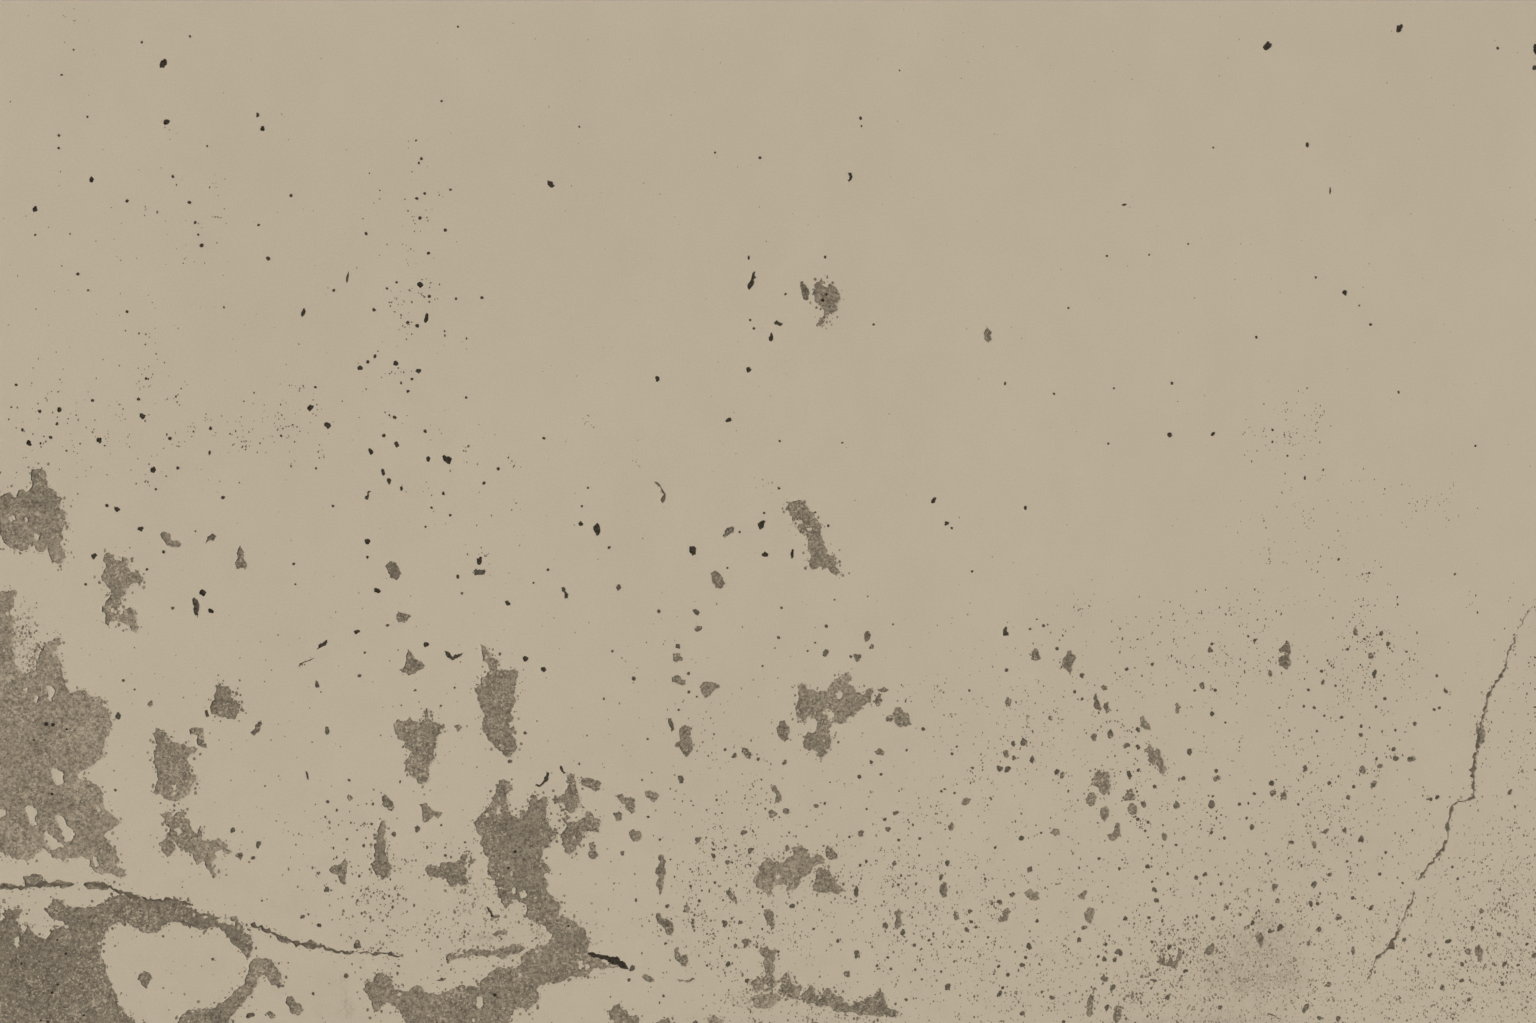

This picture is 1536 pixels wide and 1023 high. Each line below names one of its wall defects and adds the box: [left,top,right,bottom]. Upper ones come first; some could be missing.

peeling [800,277,842,327]
peeling [0,467,69,566]
peeling [785,498,840,578]
peeling [100,551,145,634]
peeling [392,643,520,823]
peeling [776,671,913,759]
peeling [0,589,304,1023]
crack [1366,599,1536,981]
crack [0,879,194,907]
crack [249,921,401,958]
peeling [361,765,660,1023]
peeling [741,844,902,1023]